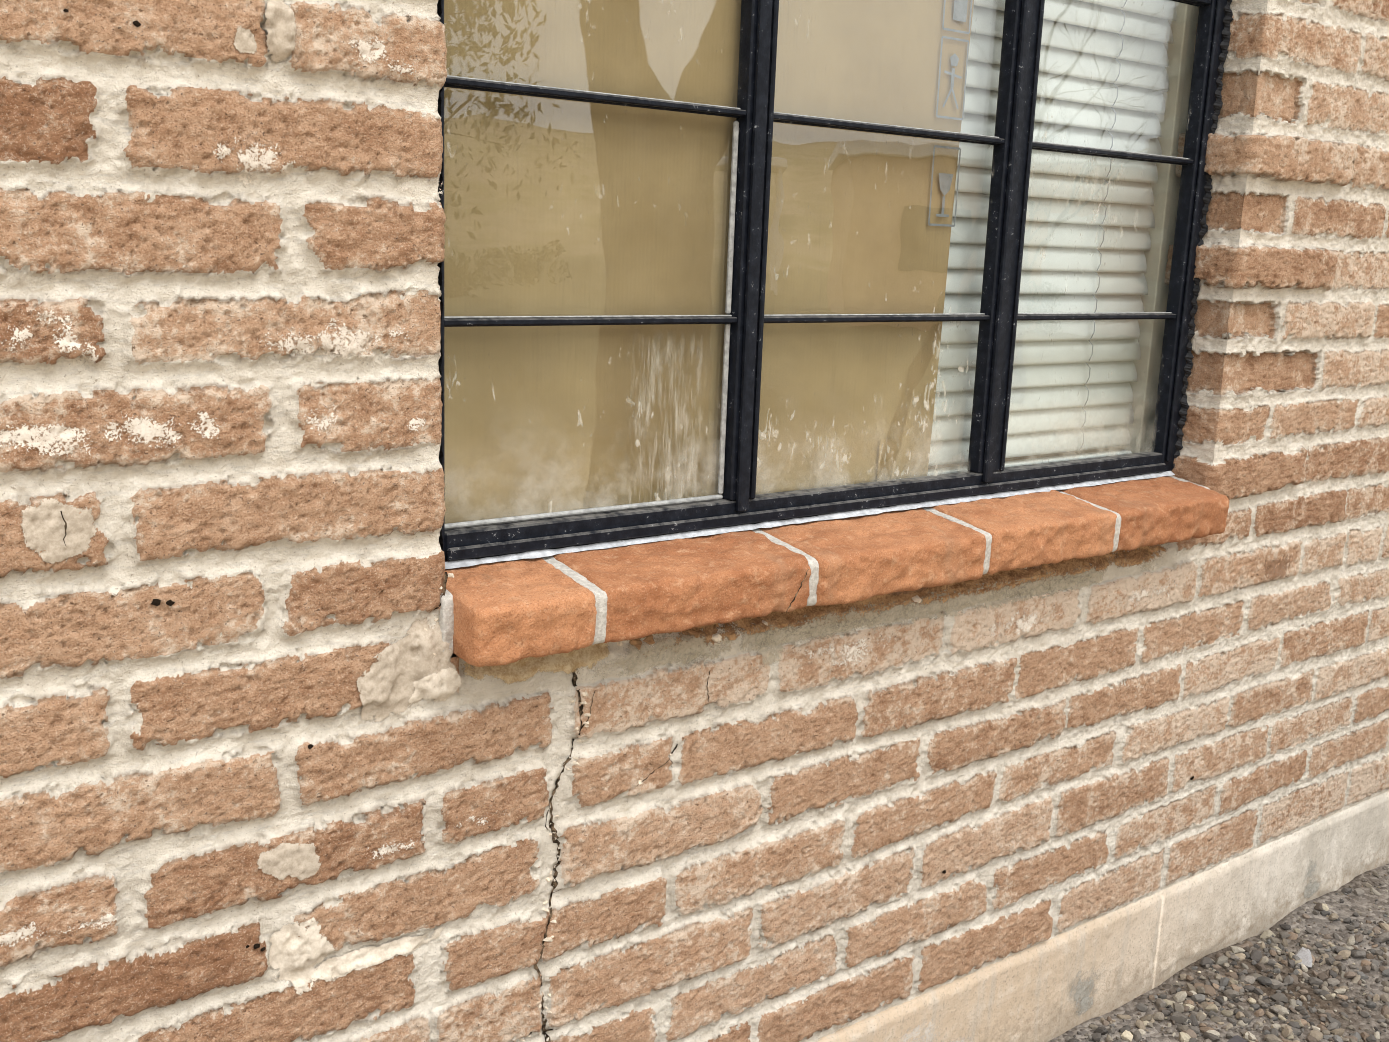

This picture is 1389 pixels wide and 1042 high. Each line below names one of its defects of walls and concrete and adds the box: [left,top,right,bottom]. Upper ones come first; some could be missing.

water stain [1,308,99,370]
water stain [257,318,409,363]
water stain [0,406,220,459]
water stain [300,407,344,435]
water stain [407,418,425,432]
crack [519,669,596,1042]